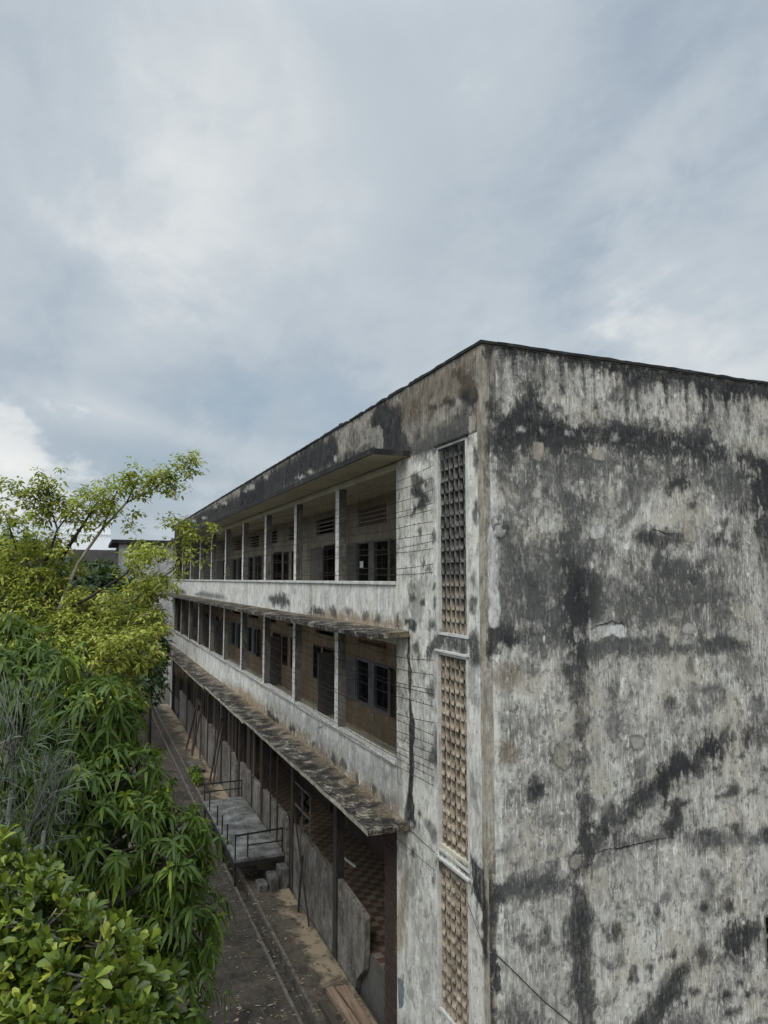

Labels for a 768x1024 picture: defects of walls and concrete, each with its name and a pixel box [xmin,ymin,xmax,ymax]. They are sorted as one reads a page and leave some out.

water stain [482,346,768,411]
water stain [175,368,768,840]
water stain [432,726,768,1024]
crack [588,837,676,856]